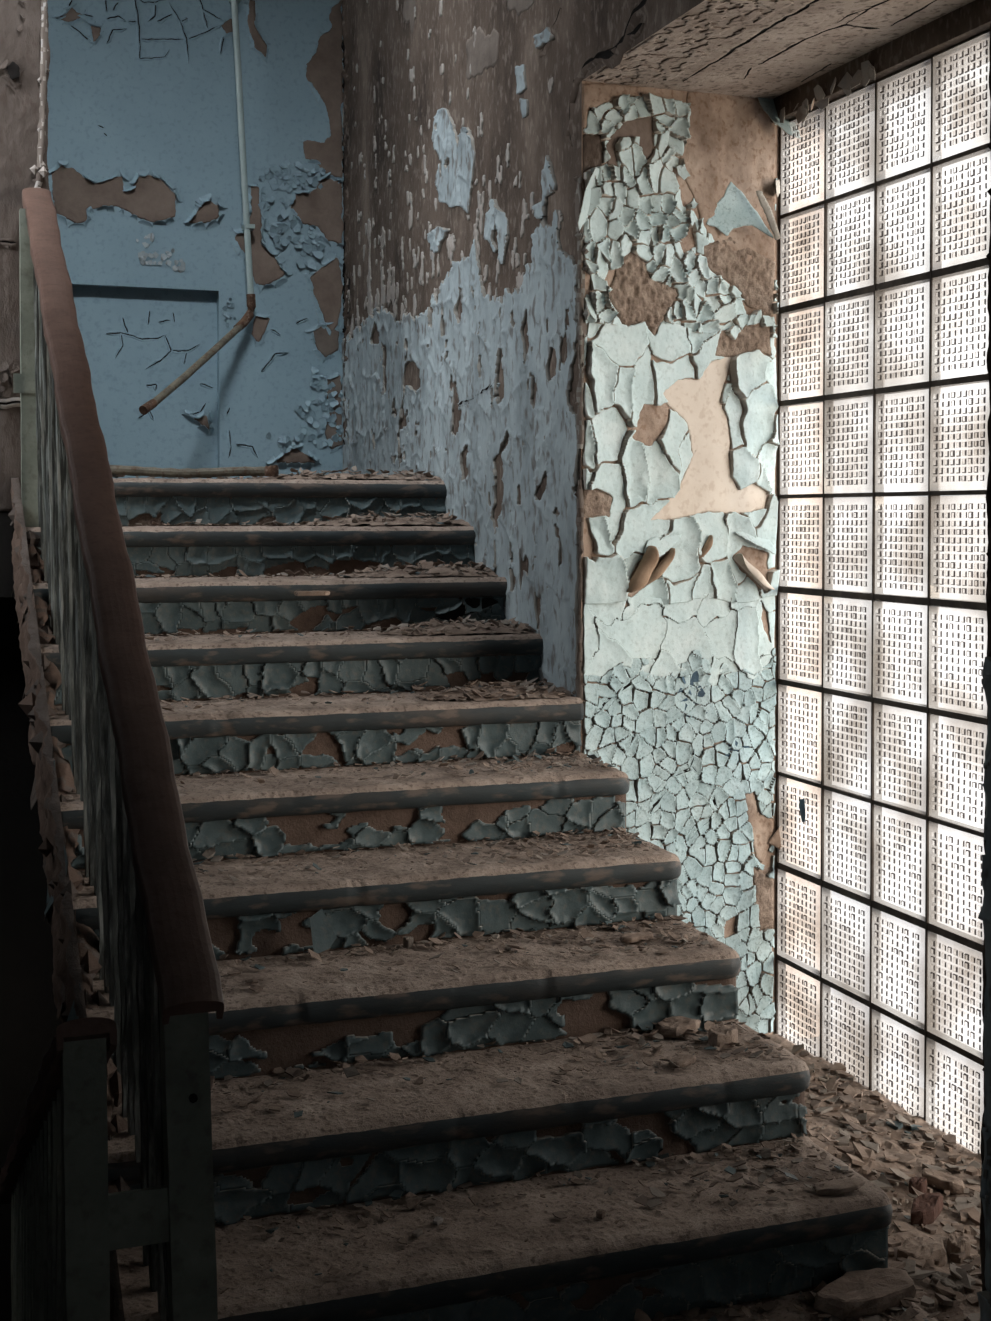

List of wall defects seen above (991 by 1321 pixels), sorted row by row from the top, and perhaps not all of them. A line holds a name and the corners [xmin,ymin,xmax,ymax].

crack [56,0,226,64]
crack [538,7,562,58]
crack [569,0,655,103]
peeling [17,0,876,717]
peeling [170,720,616,791]
flaking render [977,188,991,1321]
peeling [185,795,659,883]
crack [582,592,777,1034]
flaking render [744,792,794,931]
peeling [212,878,721,992]
peeling [209,983,790,1124]